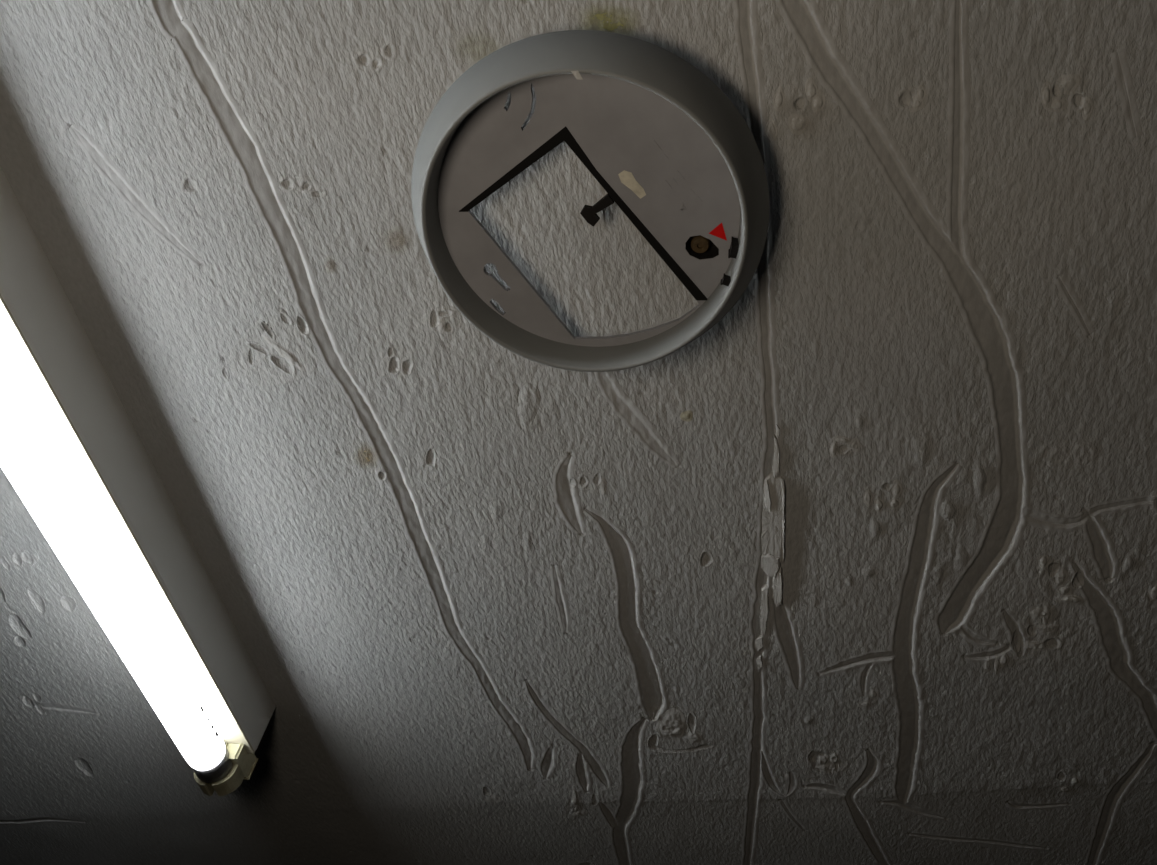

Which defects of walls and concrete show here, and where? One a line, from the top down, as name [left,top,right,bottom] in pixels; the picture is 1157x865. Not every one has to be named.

crack [148,0,668,865]
spalling [755,424,785,672]
crack [733,0,1157,865]